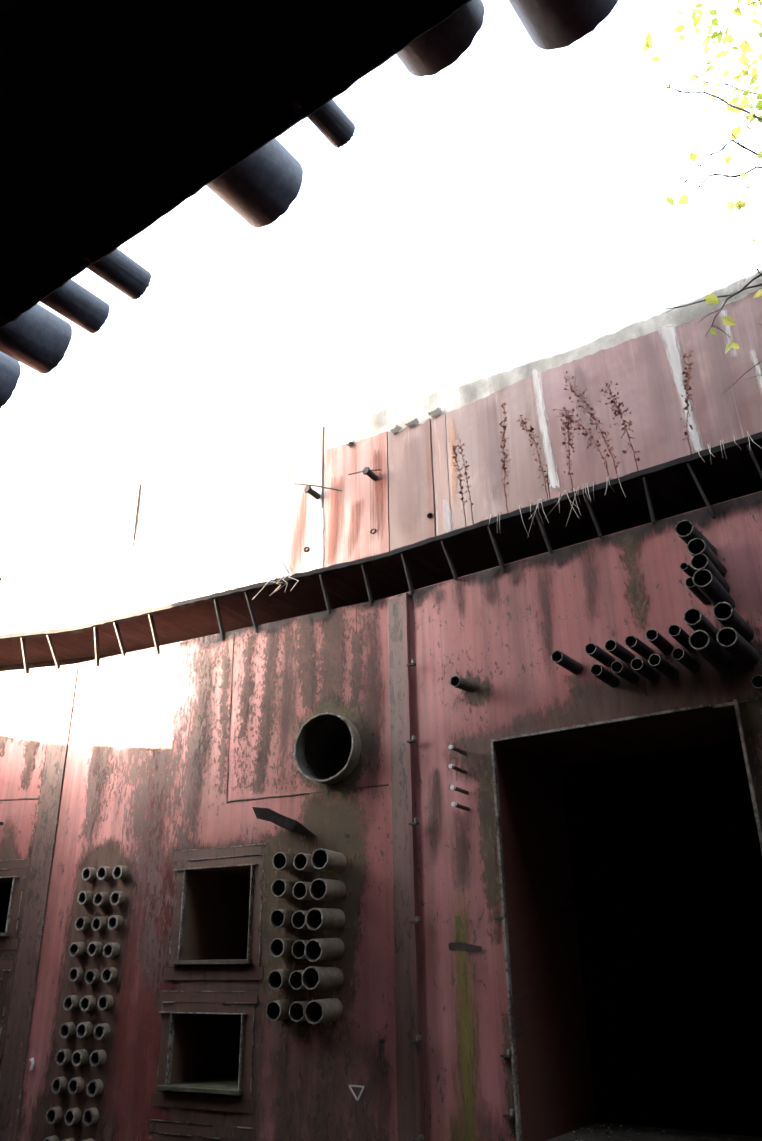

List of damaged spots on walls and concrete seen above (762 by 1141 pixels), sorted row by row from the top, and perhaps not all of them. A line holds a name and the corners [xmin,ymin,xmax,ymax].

peeling [78,609,385,1038]
damp [0,491,762,1141]